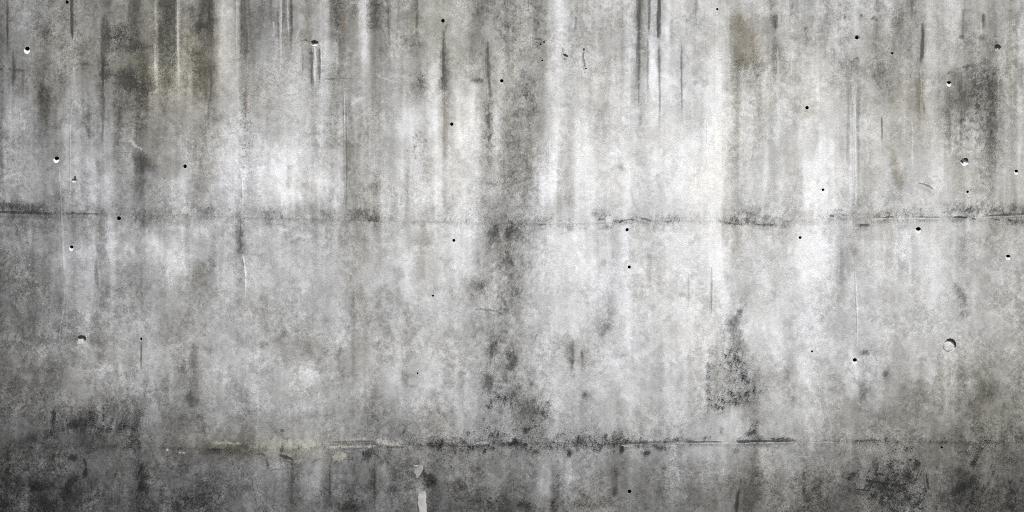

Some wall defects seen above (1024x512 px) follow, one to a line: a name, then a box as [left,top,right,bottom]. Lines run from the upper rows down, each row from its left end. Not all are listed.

water stain [99,19,153,96]
mould [708,310,762,410]